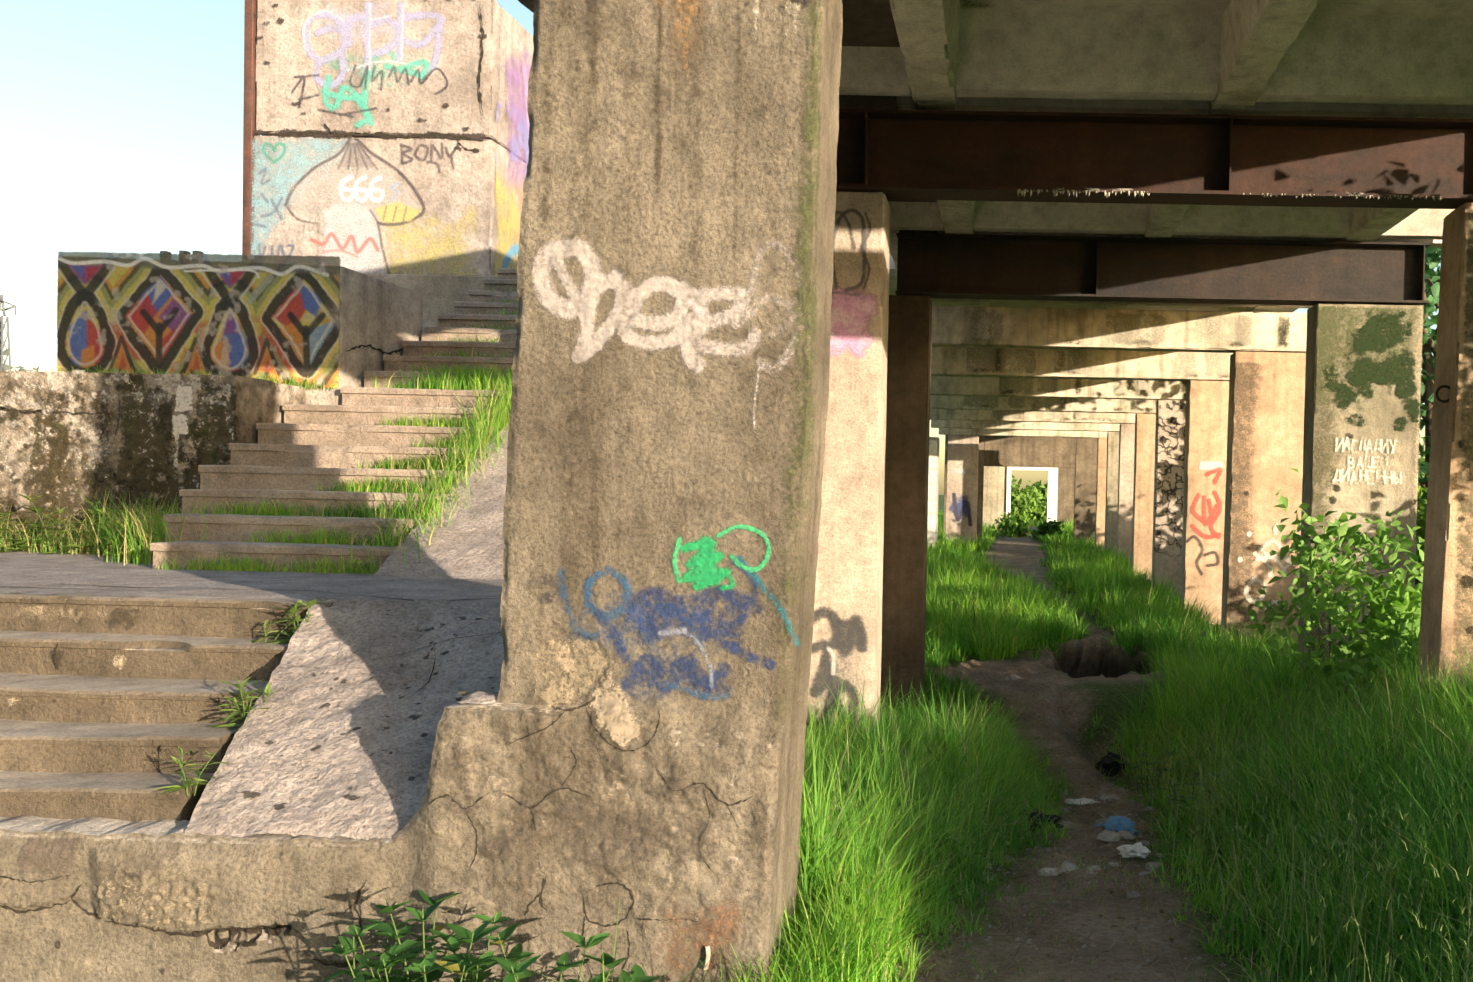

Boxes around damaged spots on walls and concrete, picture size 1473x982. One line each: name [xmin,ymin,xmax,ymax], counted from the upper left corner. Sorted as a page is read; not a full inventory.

damp [571,0,598,89]
damp [655,0,664,192]
damp [781,0,822,601]
damp [0,369,234,519]
damp [1312,306,1423,596]
damp [1455,208,1473,693]
peeling [535,637,643,748]
crack [426,677,756,916]
crack [0,875,290,950]
crack [312,880,367,968]
crack [582,882,698,969]